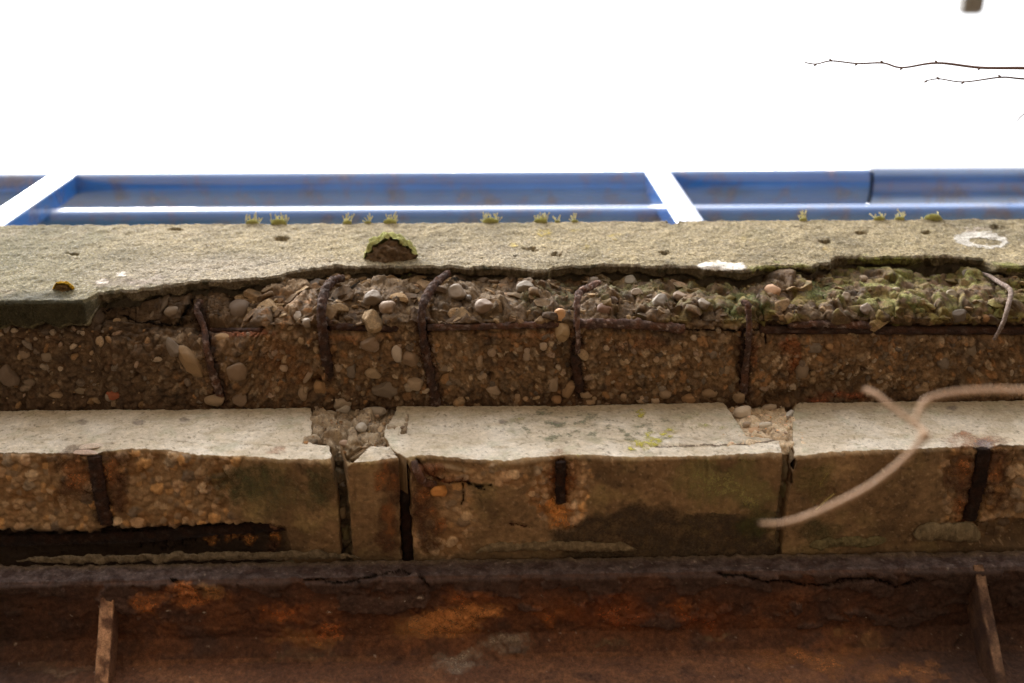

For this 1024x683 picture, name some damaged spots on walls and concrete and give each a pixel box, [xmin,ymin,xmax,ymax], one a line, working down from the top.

corrosion [197,308,352,407]
corrosion [737,325,754,406]
spalling [0,266,1024,562]
corrosion [0,445,286,552]
crack [416,459,492,505]
corrosion [538,460,577,528]
leakage [551,504,776,559]
corrosion [942,430,1014,522]
corrosion [132,582,229,612]
corrosion [405,593,501,638]
crack [718,572,922,588]